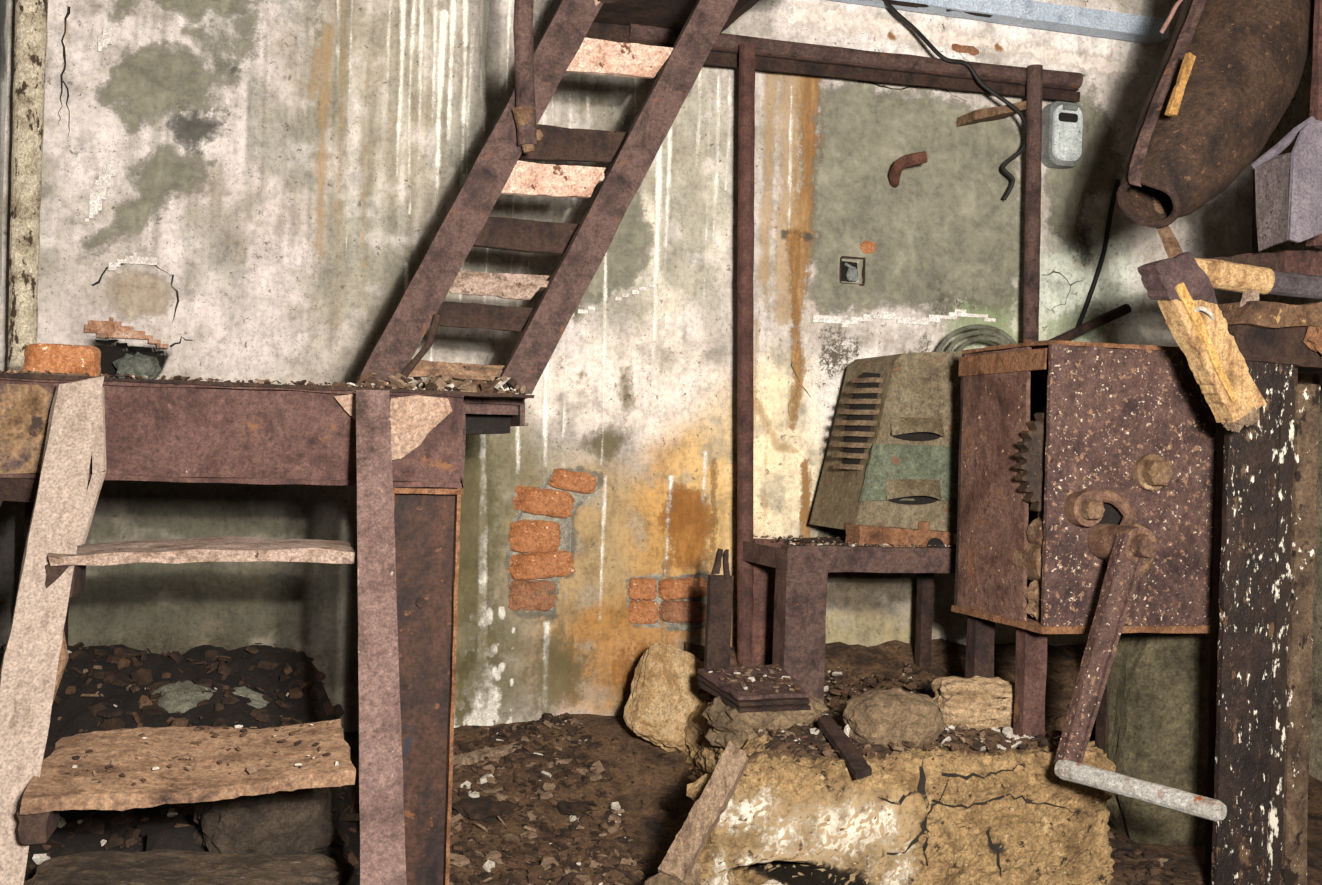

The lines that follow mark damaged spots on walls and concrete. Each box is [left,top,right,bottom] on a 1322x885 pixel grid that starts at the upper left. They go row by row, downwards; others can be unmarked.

leakage [387,0,489,194]
peeling [108,252,157,271]
corrosion [761,72,824,428]
leakage [455,437,499,716]
flaking render [506,466,604,619]
leakage [532,621,581,713]
corrosion [613,621,667,696]
flaking render [627,572,712,631]
corrosion [659,451,718,579]
corrosion [800,459,811,538]
crack [878,761,1089,878]